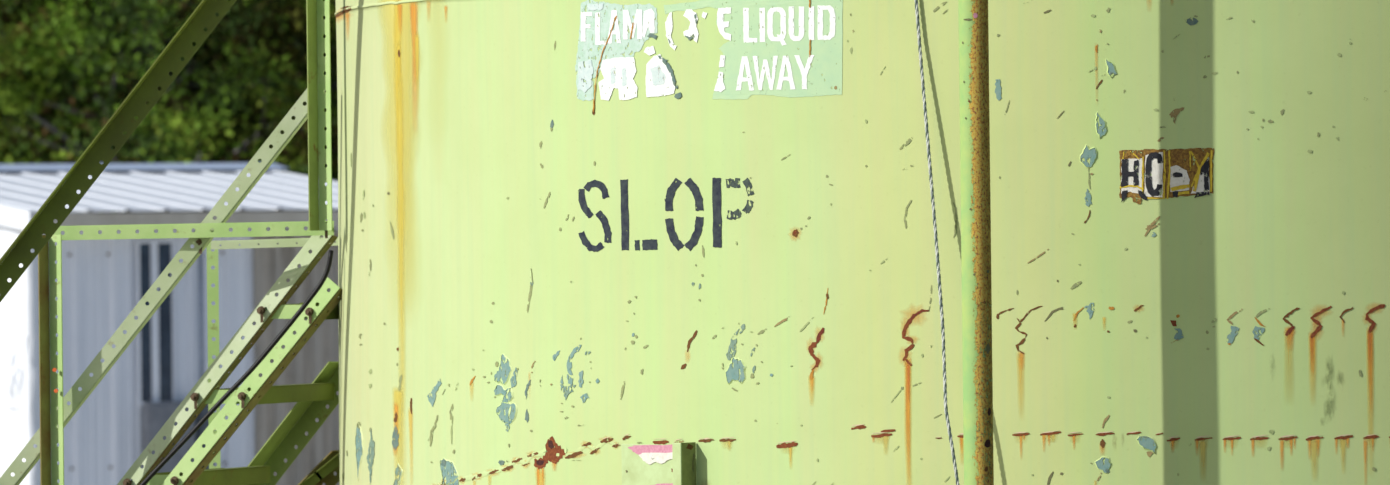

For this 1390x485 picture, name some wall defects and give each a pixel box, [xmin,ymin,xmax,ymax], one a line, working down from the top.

peeling [1089,8,1125,93]
rust [383,0,418,294]
rust [936,0,994,485]
peeling [712,323,773,391]
peeling [342,422,375,482]
peeling [392,426,403,485]
peeling [427,381,459,485]
peeling [482,338,599,465]
rust [441,434,736,485]
rust [851,424,895,446]
rust [1012,430,1390,464]